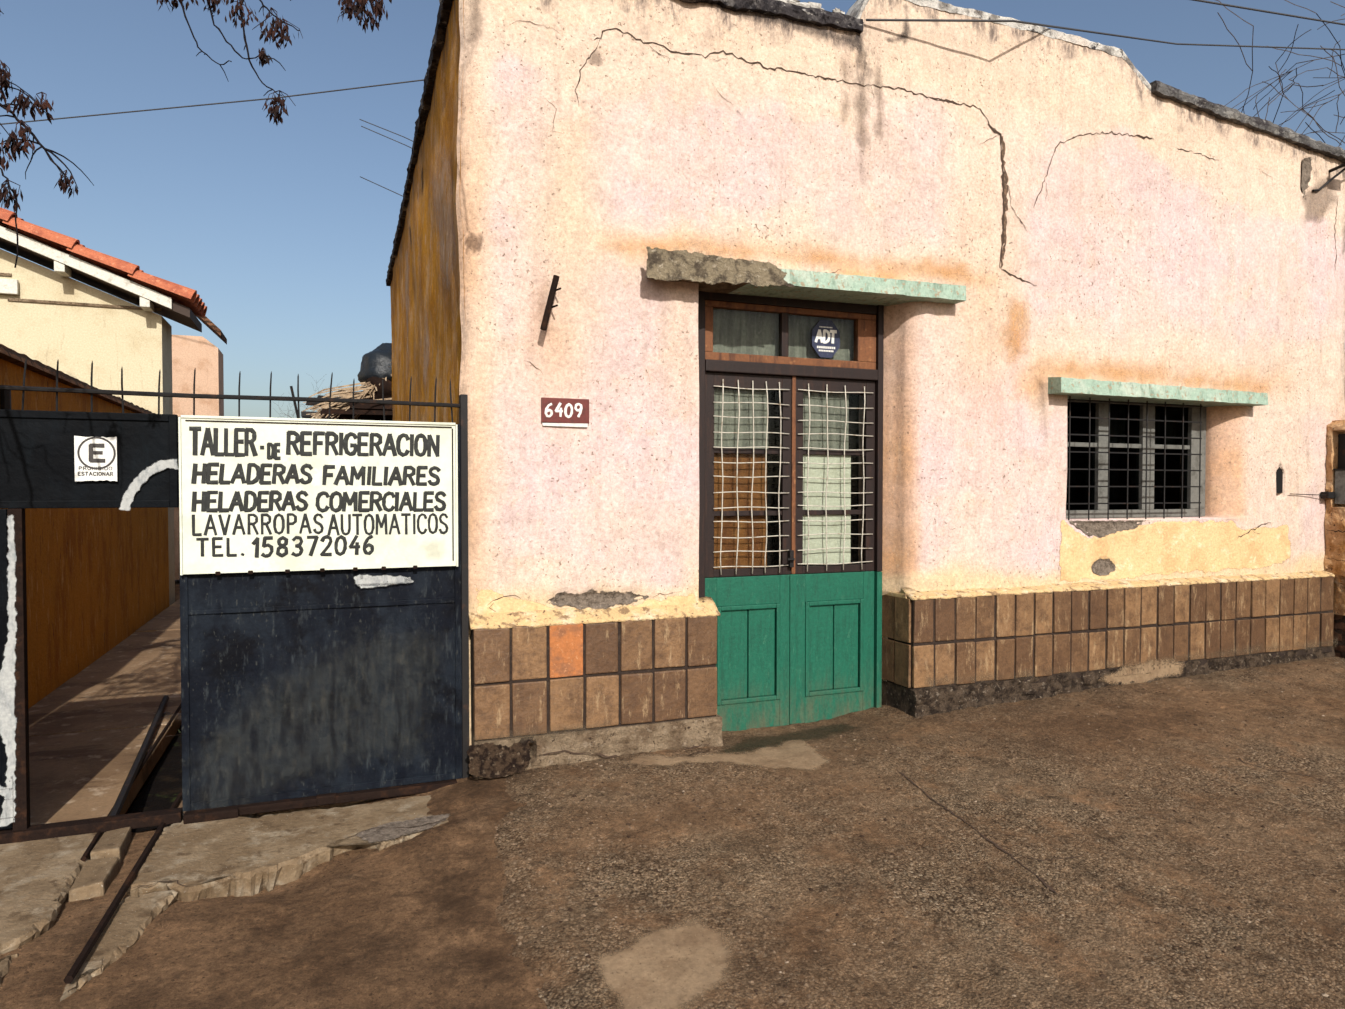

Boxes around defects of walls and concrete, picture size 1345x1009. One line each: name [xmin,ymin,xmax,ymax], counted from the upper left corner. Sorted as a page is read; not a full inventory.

crack [547,28,1215,286]
peeling [1059,519,1291,582]
peeling [476,588,697,614]